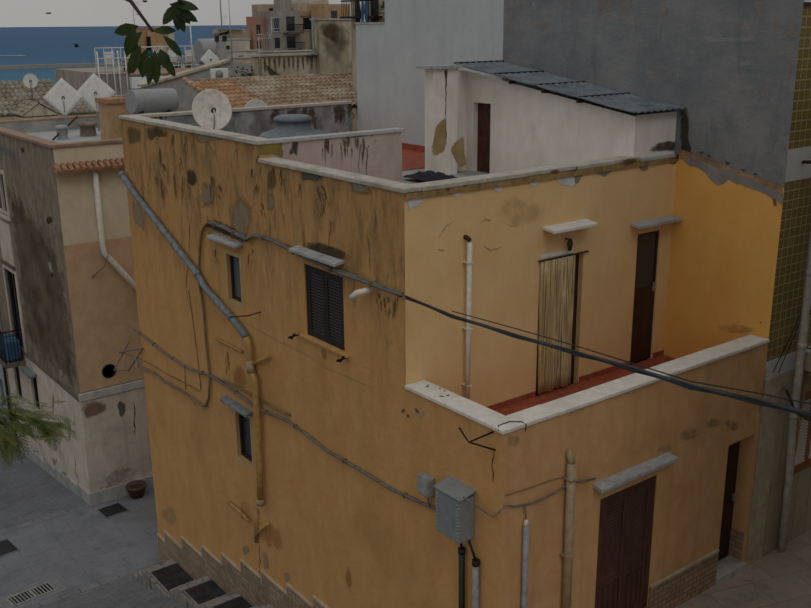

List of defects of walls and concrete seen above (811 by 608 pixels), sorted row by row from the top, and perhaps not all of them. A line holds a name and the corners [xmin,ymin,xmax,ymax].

damp [271,108,316,129]
damp [334,103,358,123]
damp [322,135,376,171]
crack [442,70,450,138]
peeling [432,119,467,167]
damp [652,109,691,160]
flaking render [84,402,106,418]